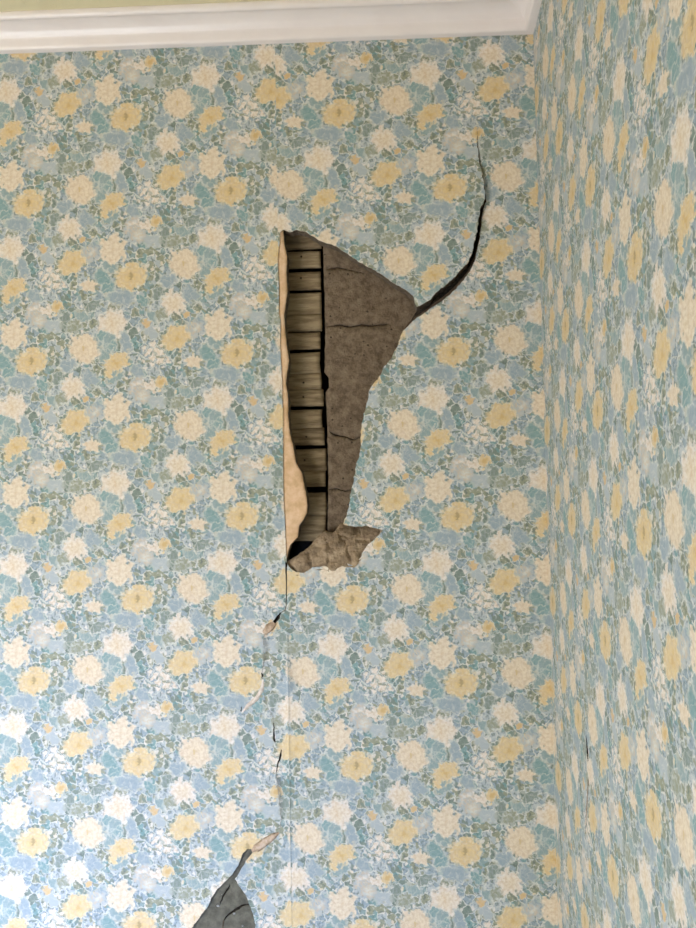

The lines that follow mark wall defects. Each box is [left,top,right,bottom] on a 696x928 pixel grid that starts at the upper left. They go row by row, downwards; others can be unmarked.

crack [405,142,486,328]
spalling [278,231,427,576]
flaking render [192,849,255,928]